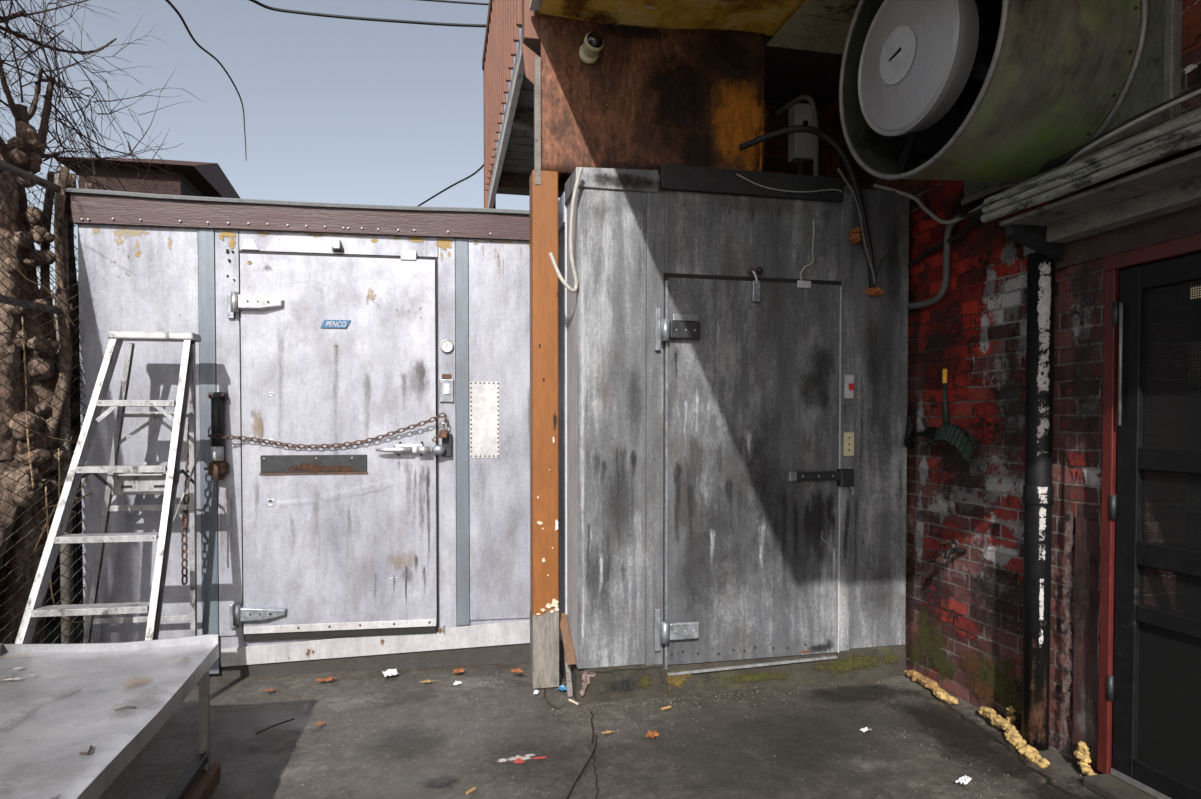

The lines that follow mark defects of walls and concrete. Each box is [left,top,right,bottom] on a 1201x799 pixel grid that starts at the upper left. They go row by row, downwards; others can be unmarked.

rust [709,80,765,171]
peeling [91,226,149,263]
peeling [978,241,1051,456]
peeling [1071,290,1095,349]
rust [288,463,356,473]
water stain [595,449,636,493]
water stain [674,464,713,553]
peeling [1038,487,1048,560]
peeling [1068,452,1102,494]
spalling [1059,507,1074,742]
crack [588,711,599,799]